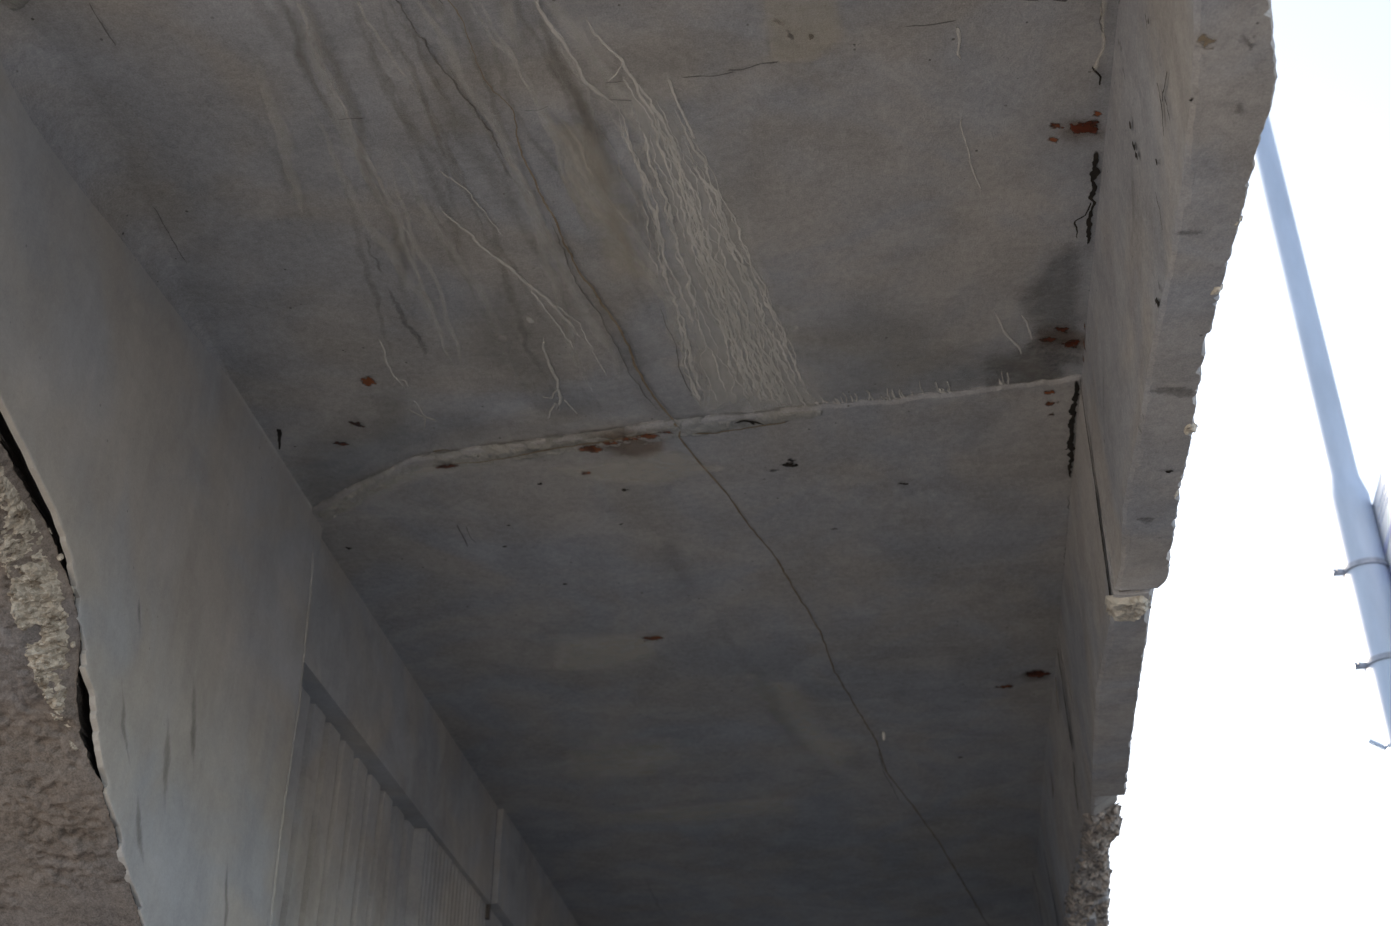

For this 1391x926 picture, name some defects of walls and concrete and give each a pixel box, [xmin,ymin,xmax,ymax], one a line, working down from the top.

corrosion [1048,111,1102,142]
crack [1073,152,1101,244]
corrosion [1040,323,1086,362]
corrosion [433,431,672,468]
crack [396,0,987,923]
crack [1065,381,1111,596]
spalling [0,449,82,750]
corrosion [1027,670,1051,678]
spalling [1064,802,1123,926]